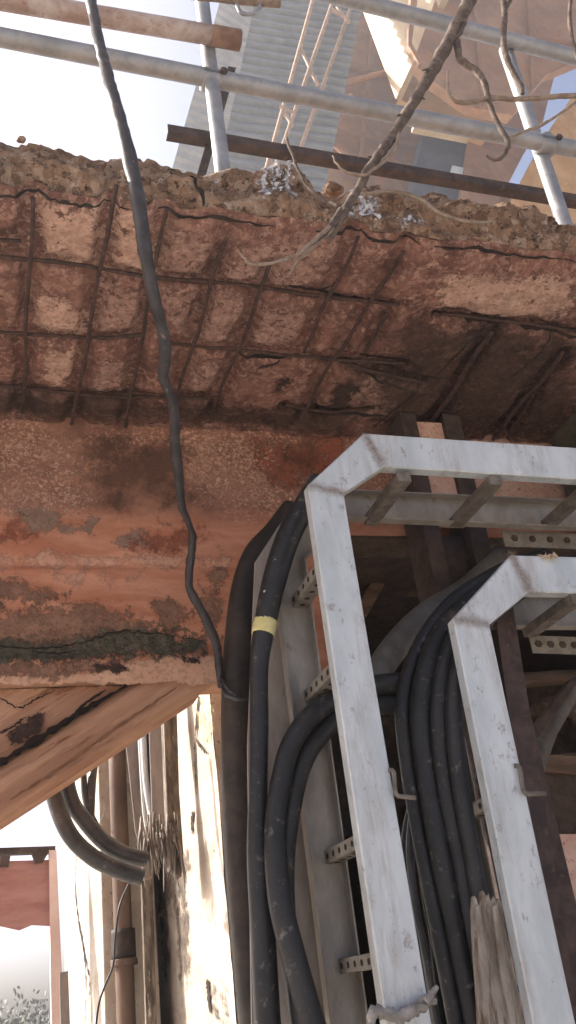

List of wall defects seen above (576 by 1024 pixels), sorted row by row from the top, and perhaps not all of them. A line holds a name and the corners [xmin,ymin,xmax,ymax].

crack [158,172,275,227]
damp [255,160,297,198]
damp [348,188,381,227]
spalling [0,142,576,394]
crack [316,226,576,263]
spalling [317,370,425,422]
peeling [0,430,101,539]
damp [93,436,184,508]
rust [127,524,205,553]
damp [0,655,125,684]
crack [0,684,207,834]
crack [205,979,213,1013]